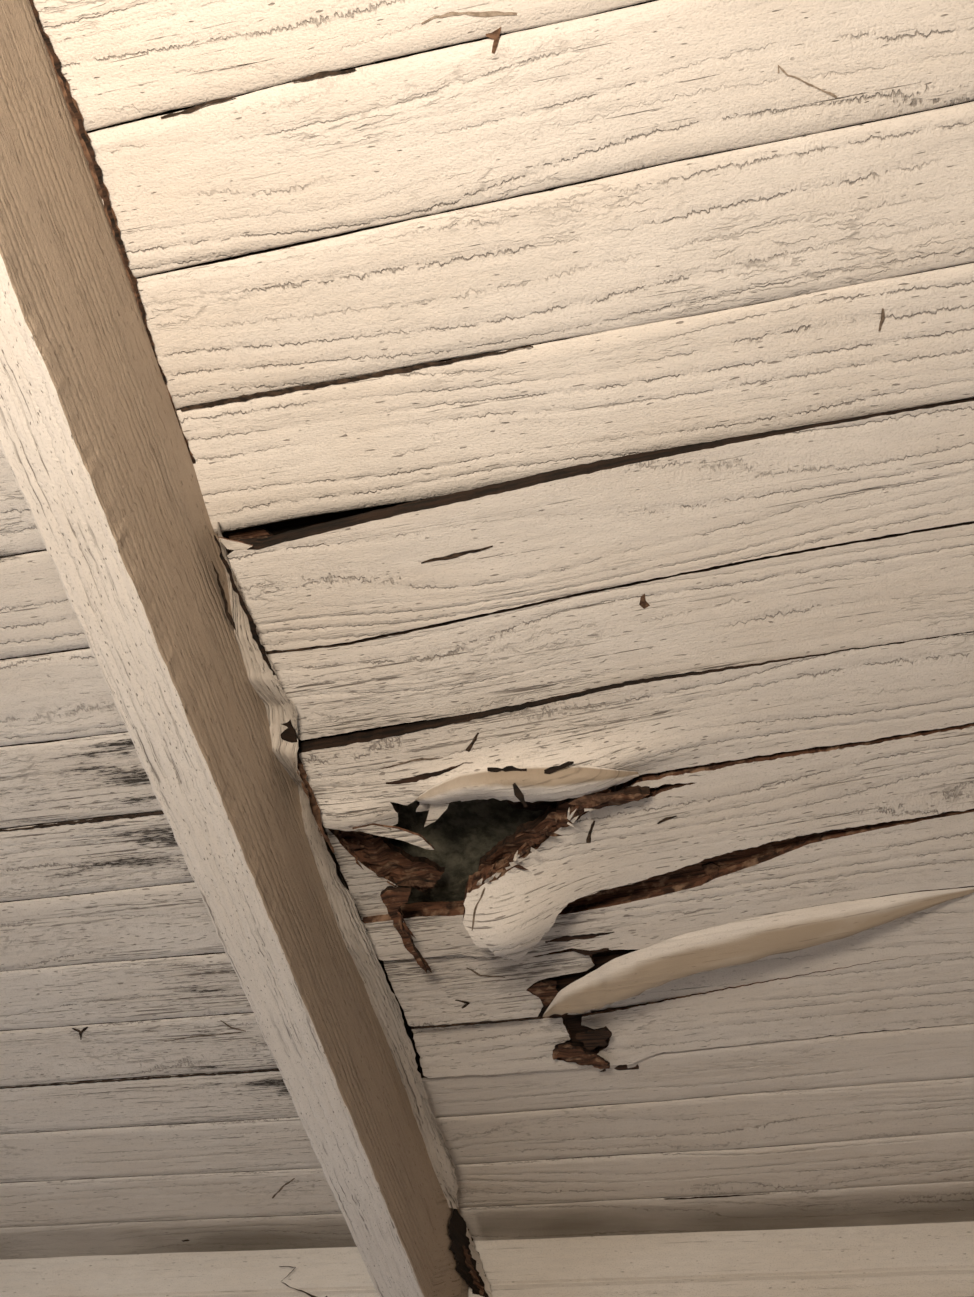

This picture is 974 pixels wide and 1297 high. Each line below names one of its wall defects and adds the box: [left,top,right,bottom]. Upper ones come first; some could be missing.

peeling [352,803,449,850]
spalling [478,775,650,871]
crack [586,821,595,843]
peeling [552,1026,612,1069]